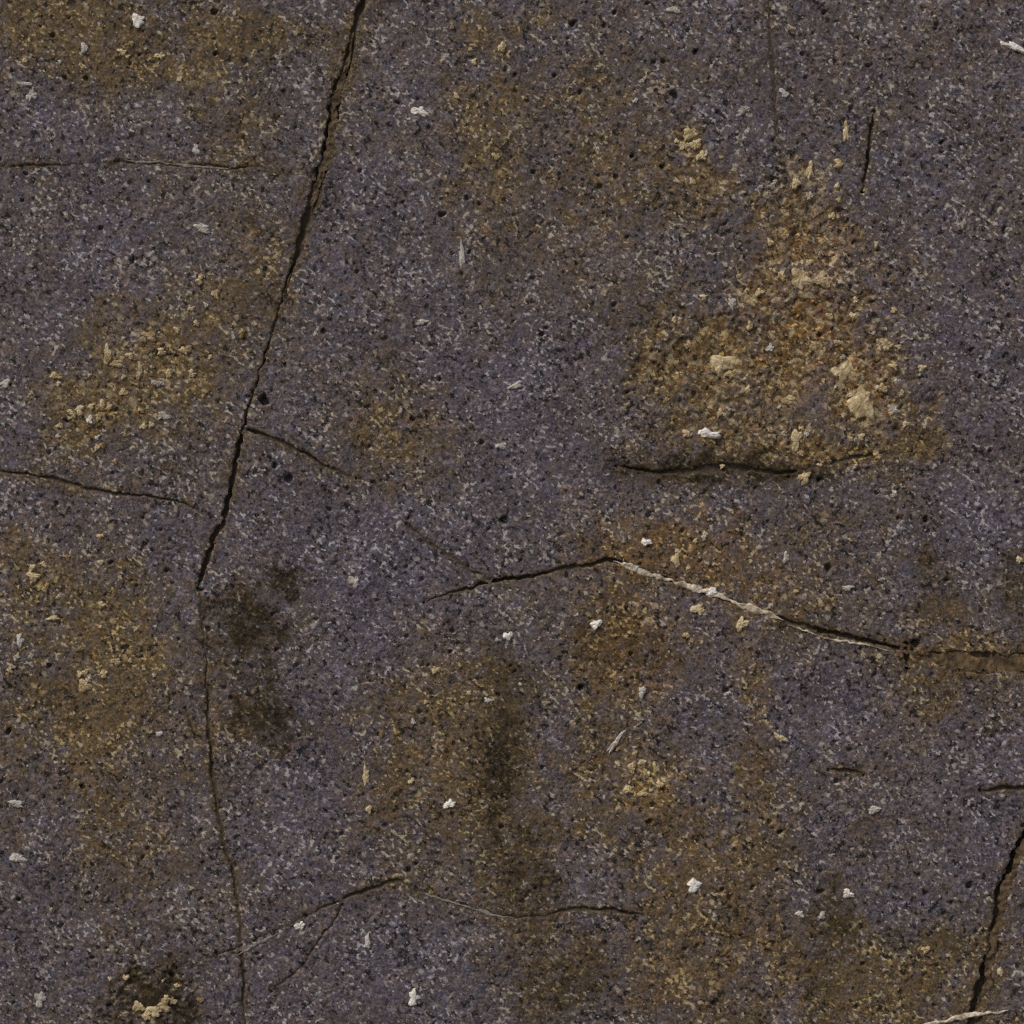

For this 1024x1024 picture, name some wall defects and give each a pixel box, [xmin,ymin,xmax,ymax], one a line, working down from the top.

crack [0,0,800,1024]
crack [617,448,911,479]
crack [405,523,1024,679]
crack [980,783,1024,795]
crack [925,826,1024,1024]